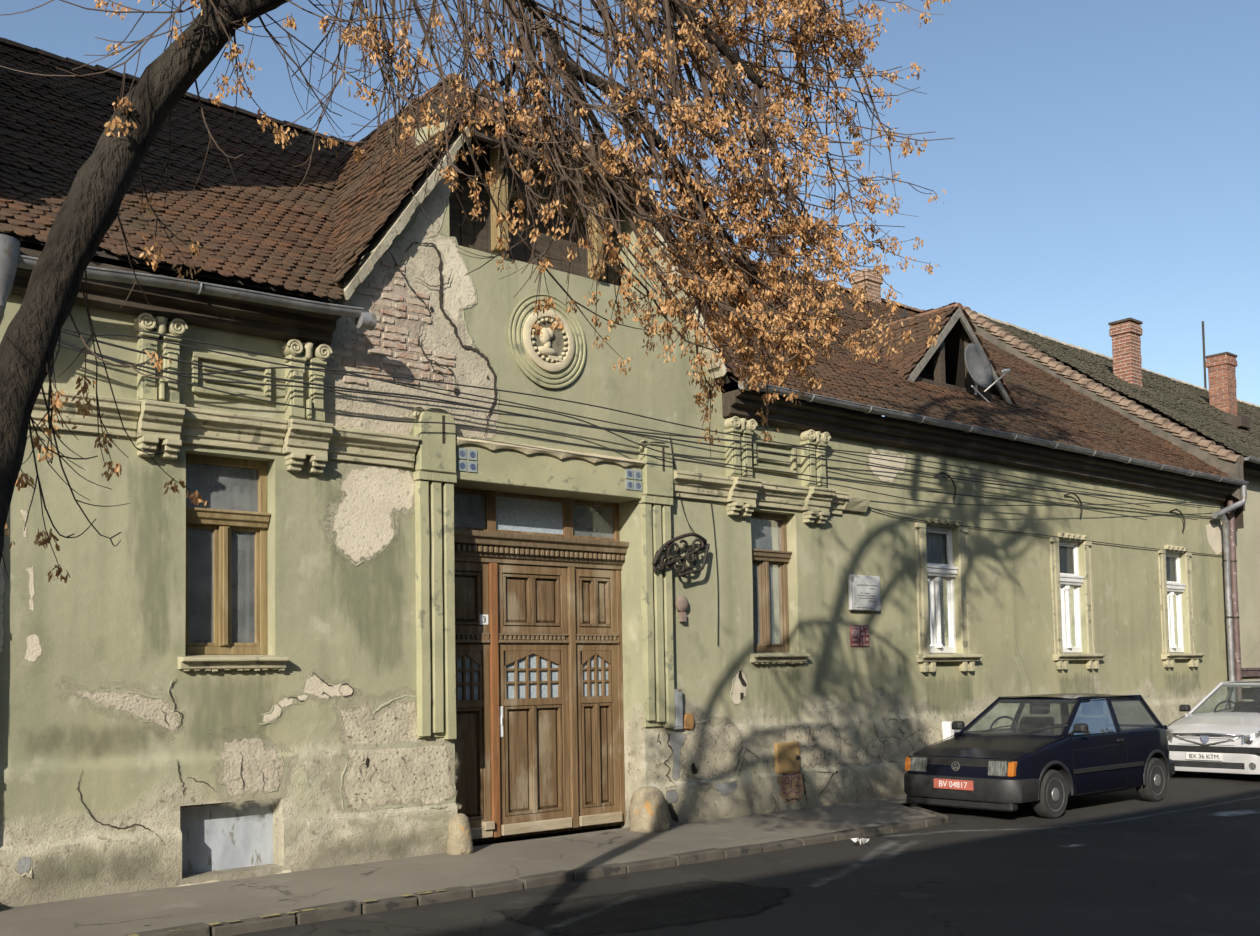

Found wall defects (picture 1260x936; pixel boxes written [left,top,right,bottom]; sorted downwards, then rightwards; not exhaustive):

flaking render [325,160,499,439]
peeling [321,461,415,567]
peeling [25,634,42,662]
crack [76,769,164,845]
flaking render [58,683,185,735]
flaking render [208,672,457,826]
flaking render [666,716,745,823]
flaking render [730,668,748,705]